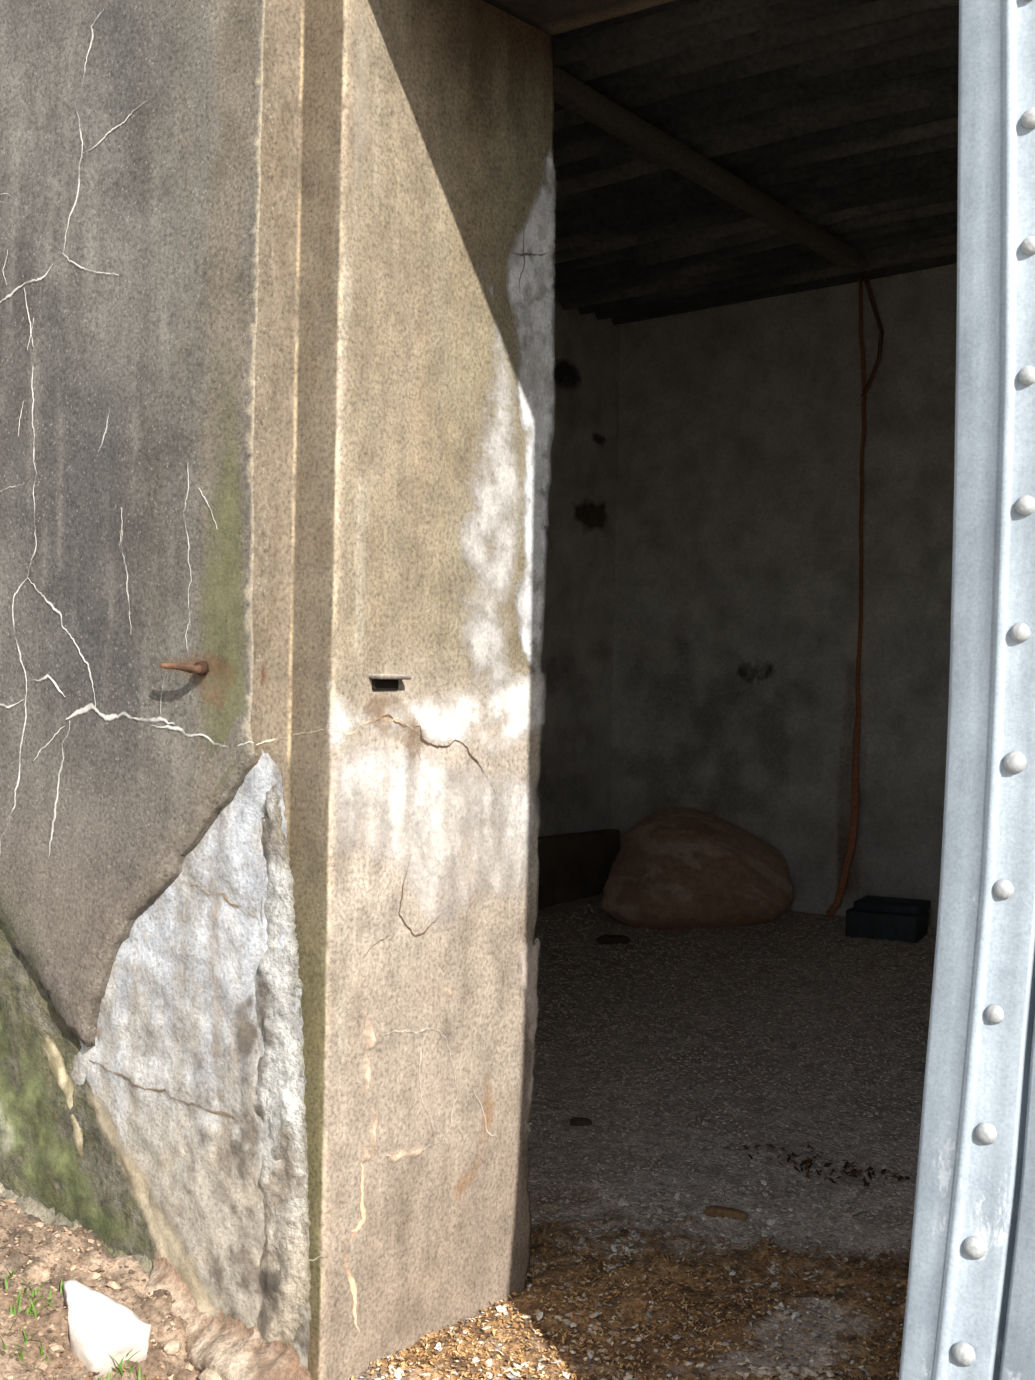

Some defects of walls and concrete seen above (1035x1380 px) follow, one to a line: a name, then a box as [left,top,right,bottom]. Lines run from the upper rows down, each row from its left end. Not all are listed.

crack [84,9,104,73]
crack [0,101,501,854]
spalling [0,750,311,1370]
crack [363,822,443,958]